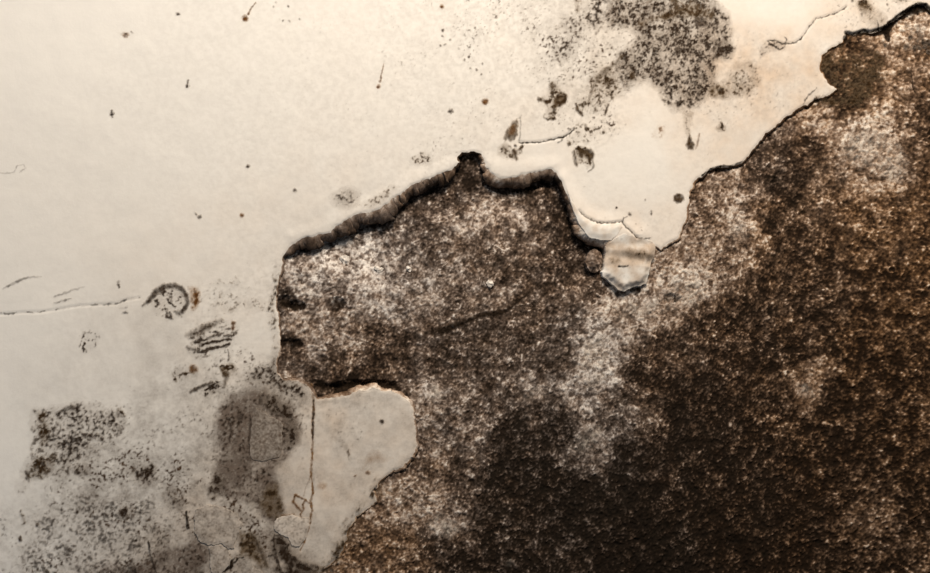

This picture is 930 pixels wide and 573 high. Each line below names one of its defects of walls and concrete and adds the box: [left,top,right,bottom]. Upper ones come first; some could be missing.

crack [770,2,930,50]
water stain [537,0,758,165]
spalling [274,4,930,573]
water stain [188,321,237,396]
water stain [25,404,124,480]
water stain [132,464,157,485]
water stain [208,364,305,522]
crack [281,384,315,550]
water stain [28,497,208,573]
crack [224,557,244,572]
water stain [239,526,349,573]